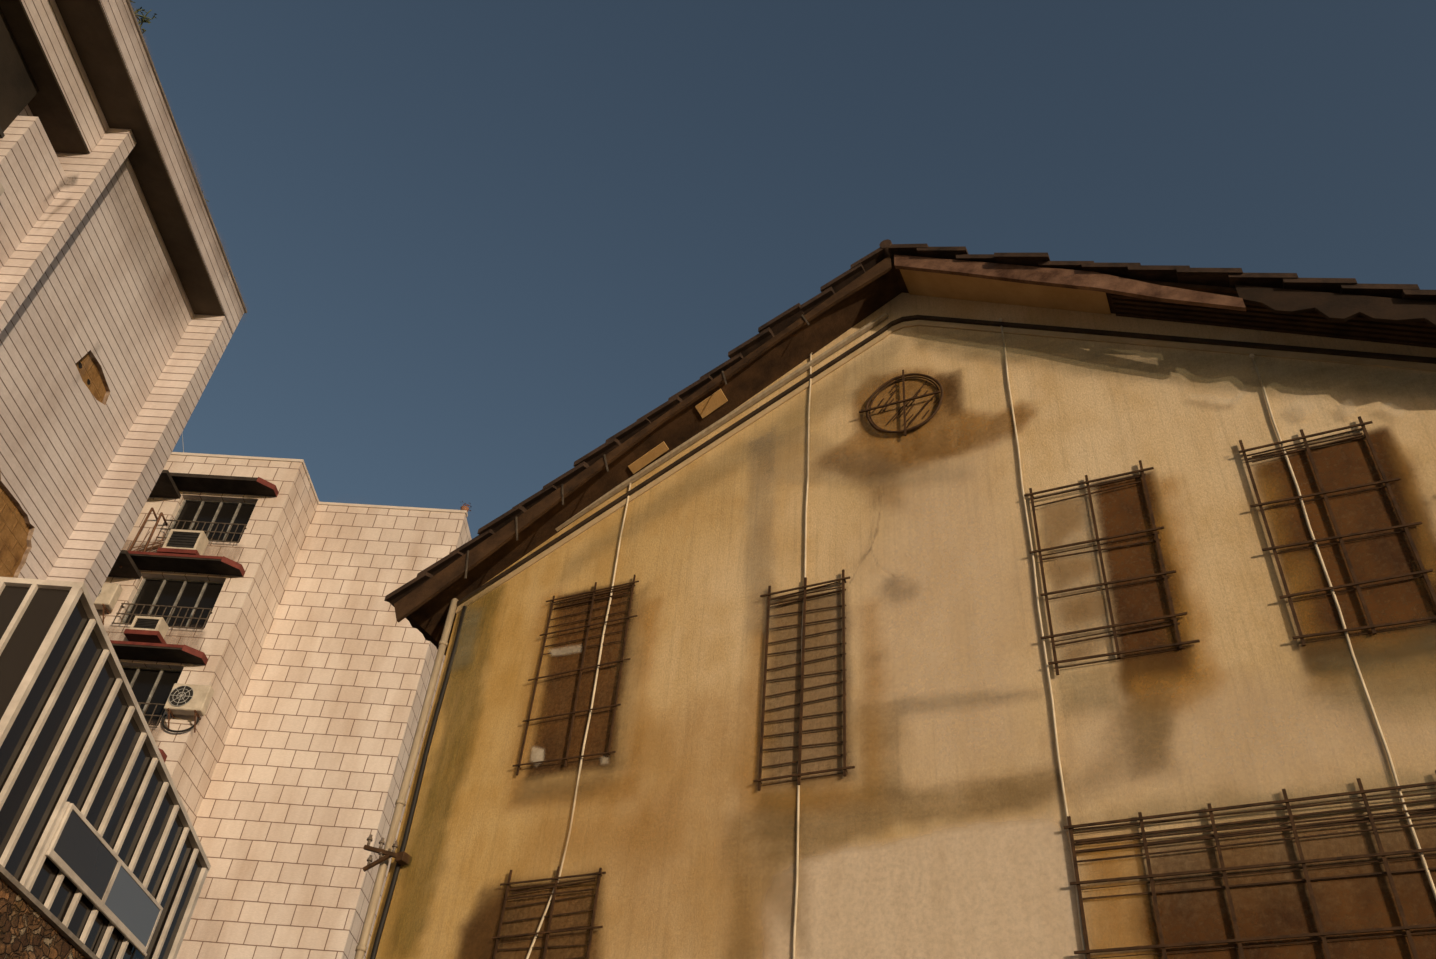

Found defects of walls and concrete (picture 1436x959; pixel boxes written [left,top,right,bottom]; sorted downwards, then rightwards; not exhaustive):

spalling [76,350,110,405]
spalling [0,471,35,578]